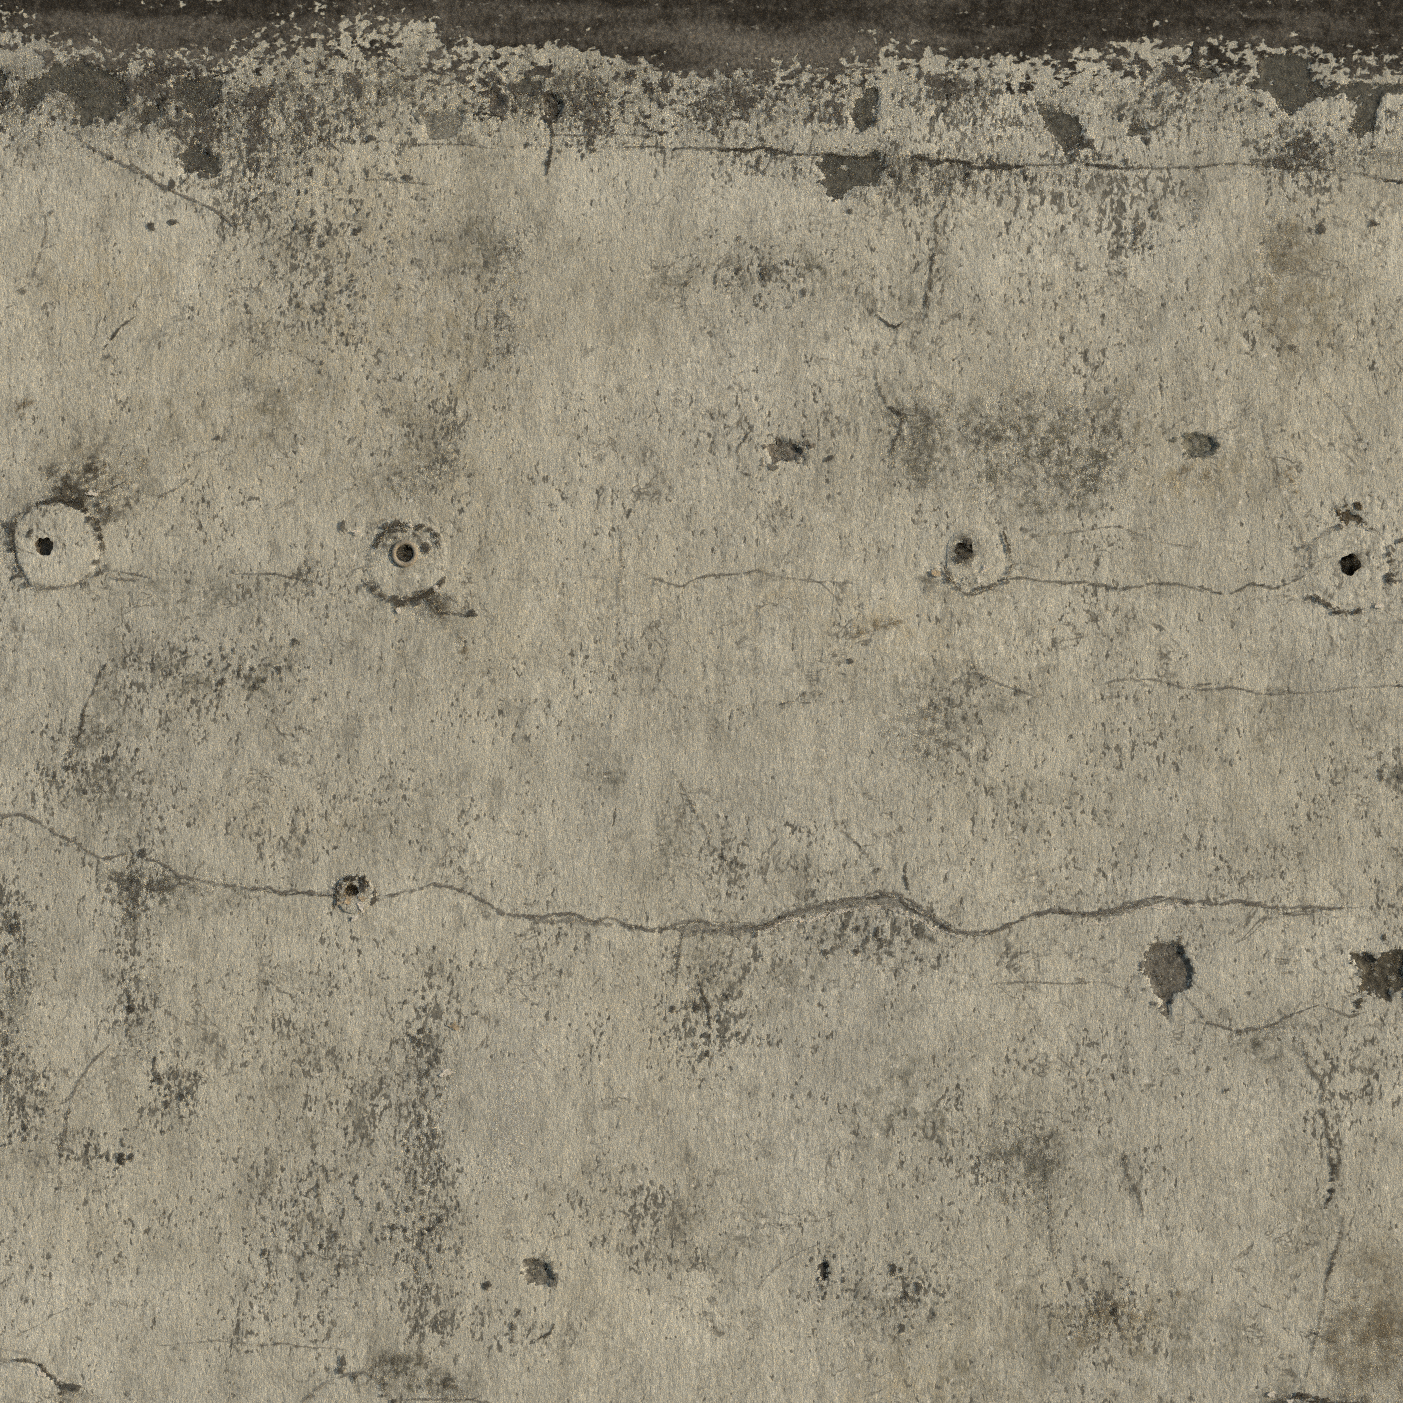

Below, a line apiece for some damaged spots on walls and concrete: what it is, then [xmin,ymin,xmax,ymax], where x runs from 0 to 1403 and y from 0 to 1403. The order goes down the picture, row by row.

peeling [0,61,223,131]
crack [528,81,685,176]
water stain [0,0,1403,202]
peeling [837,83,880,134]
peeling [702,101,1152,214]
peeling [1193,46,1403,192]
crack [719,146,1148,330]
crack [1198,529,1399,616]
crack [0,813,1348,1032]
spalling [1139,931,1197,1019]
spalling [1350,933,1403,1012]
crack [1325,1125,1341,1209]